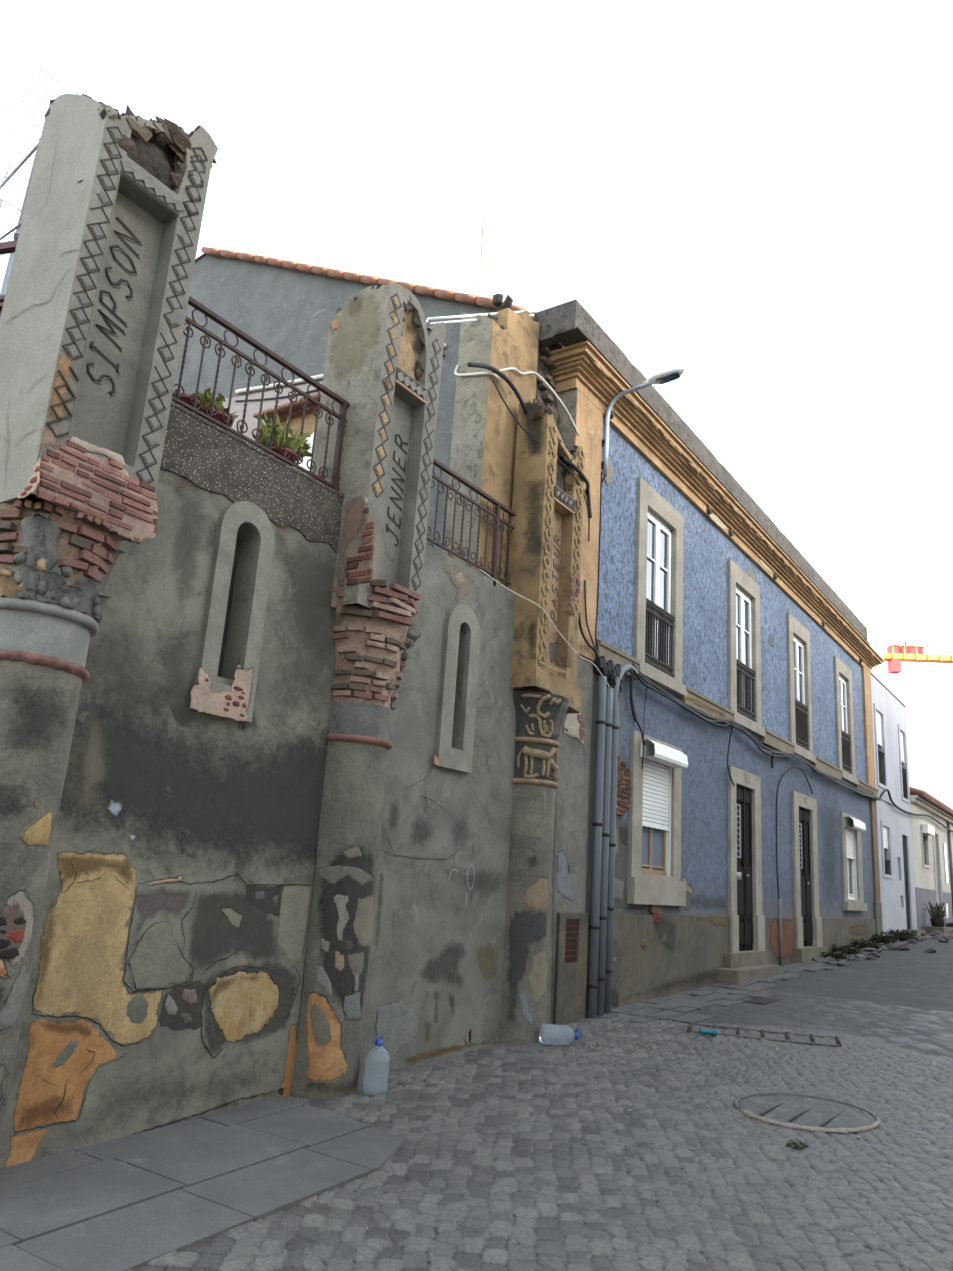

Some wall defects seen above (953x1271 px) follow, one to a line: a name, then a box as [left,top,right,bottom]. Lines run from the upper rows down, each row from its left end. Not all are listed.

flaking render [17,357,158,544]
flaking render [345,497,375,586]
leakage [12,642,327,876]
flaking render [190,664,254,721]
flaking render [0,799,284,1167]
flaking render [276,846,374,1098]
flaking render [508,850,576,1025]